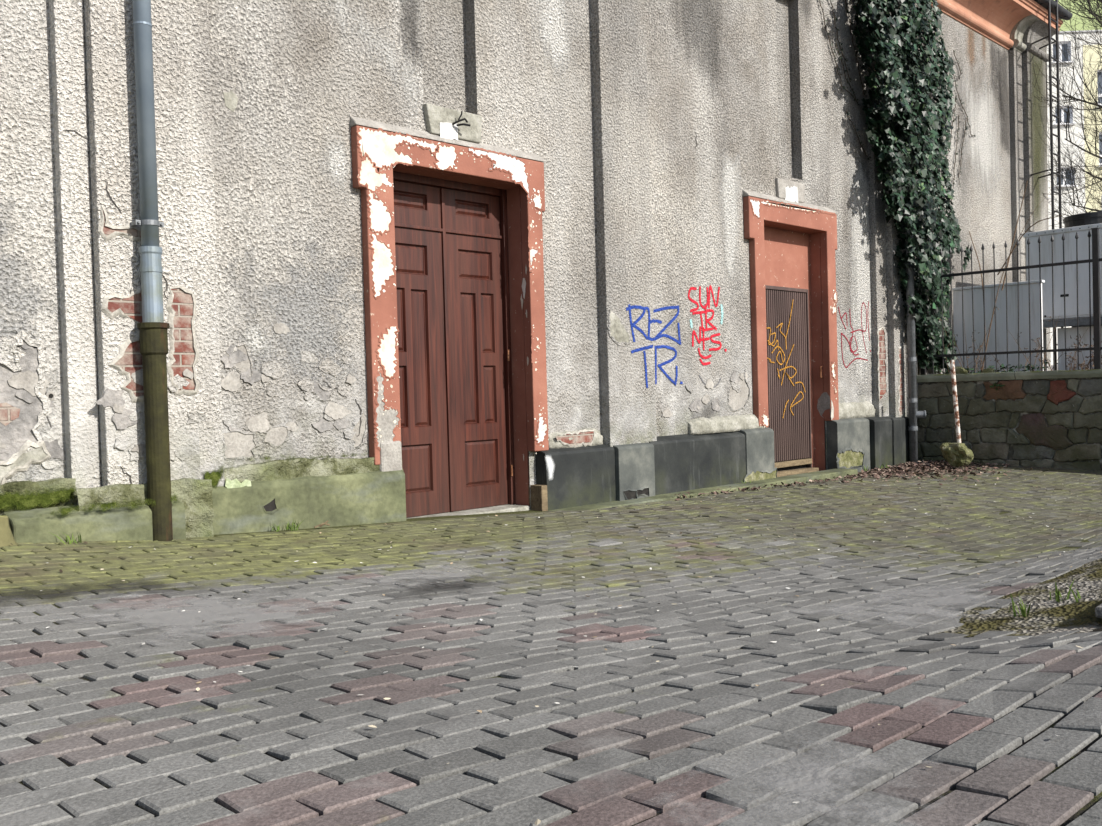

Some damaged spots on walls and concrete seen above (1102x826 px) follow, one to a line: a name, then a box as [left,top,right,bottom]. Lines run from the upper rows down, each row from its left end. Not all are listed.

peeling [356,122,543,371]
spalling [0,330,66,485]
flaking render [95,286,146,461]